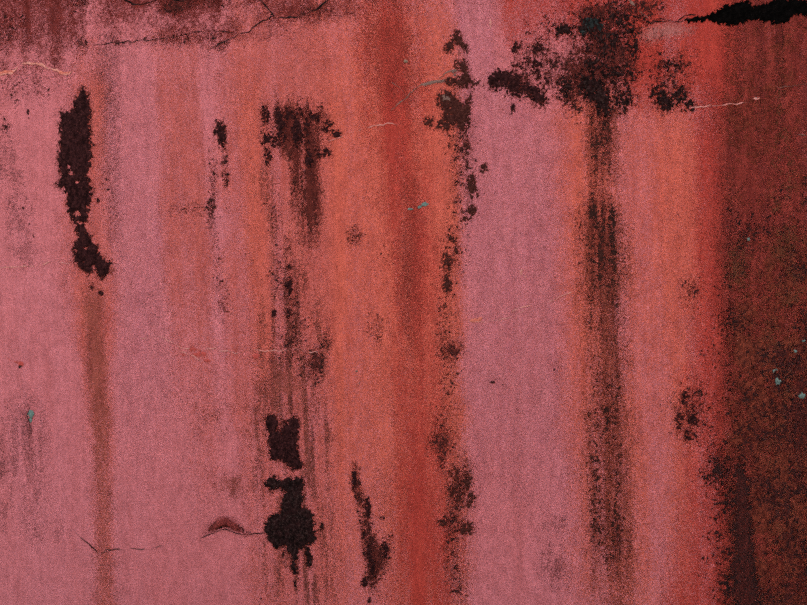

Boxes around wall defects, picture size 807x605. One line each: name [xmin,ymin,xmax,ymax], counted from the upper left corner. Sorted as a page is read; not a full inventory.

corrosion [54,33,126,605]
crack [90,0,328,50]
corrosion [142,0,479,605]
corrosion [493,0,807,605]
crack [629,0,708,24]
spalling [685,0,807,27]